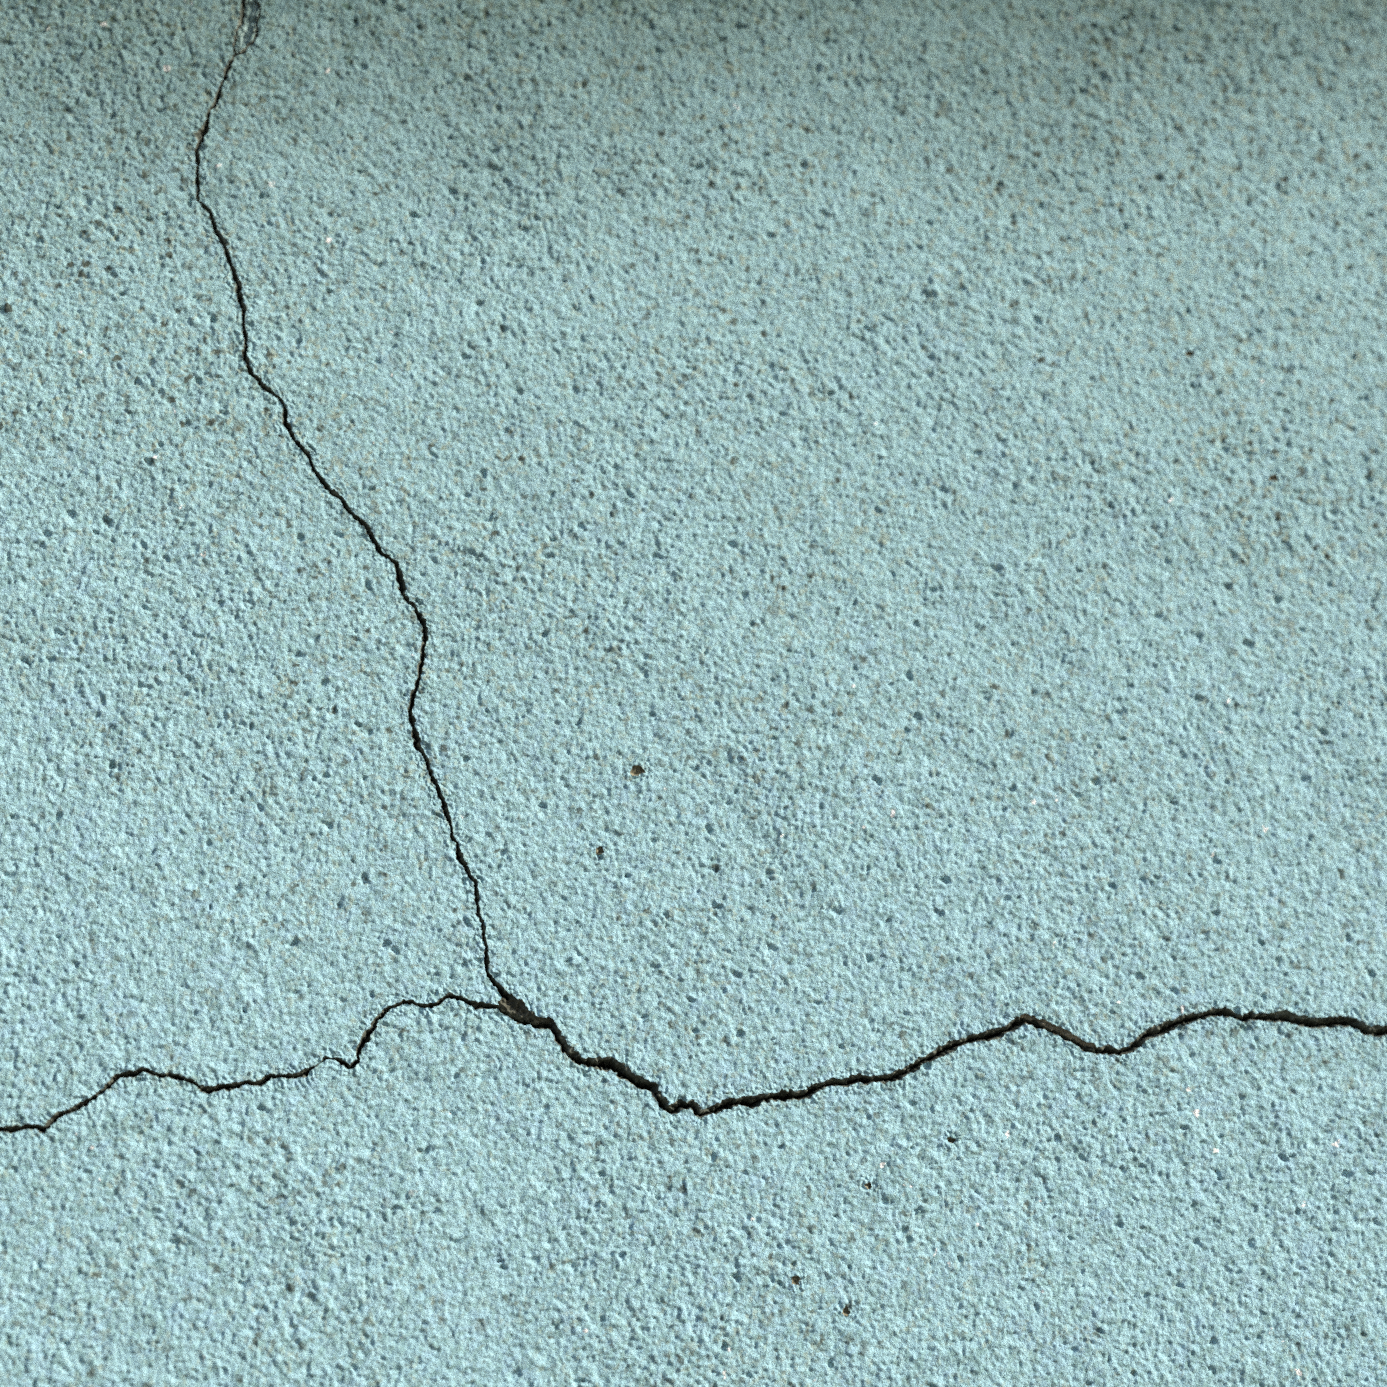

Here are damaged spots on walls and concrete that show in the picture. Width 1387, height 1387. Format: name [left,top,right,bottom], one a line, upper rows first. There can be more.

crack [194,0,510,1001]
crack [0,992,1387,1134]